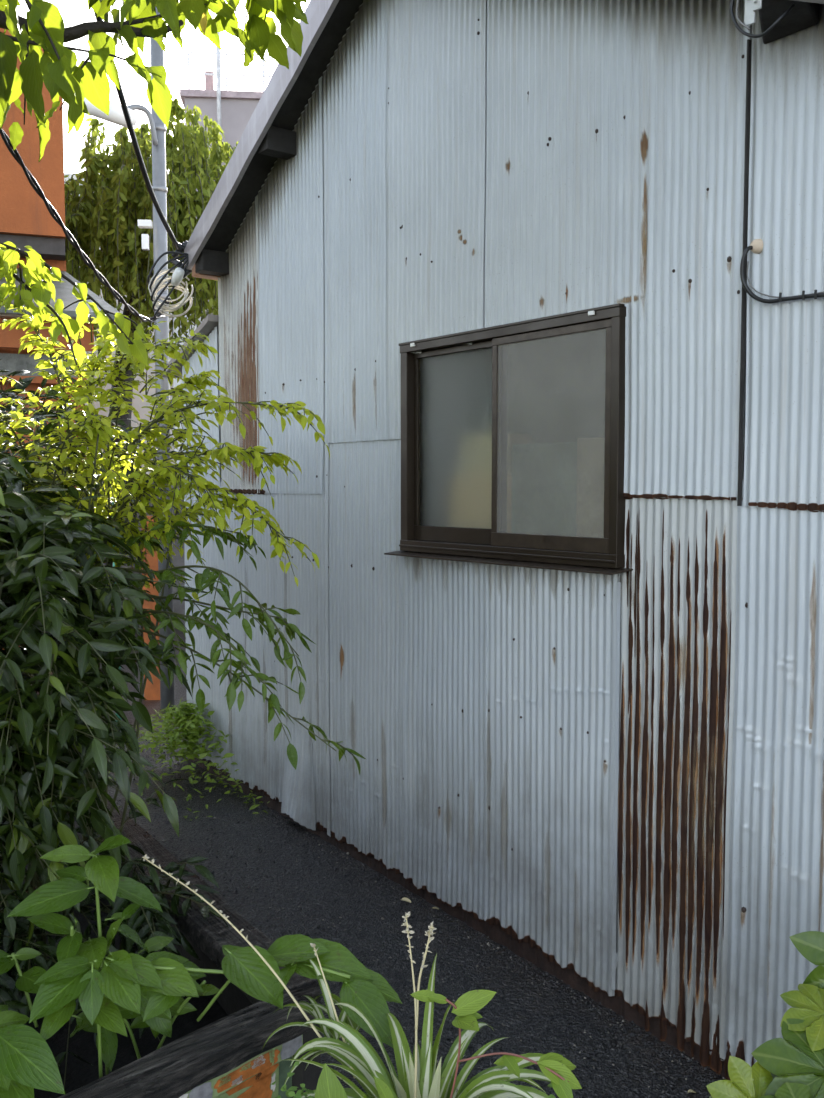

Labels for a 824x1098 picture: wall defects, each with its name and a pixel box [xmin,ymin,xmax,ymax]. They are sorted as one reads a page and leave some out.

rust [226,277,265,495]
rust [316,493,824,1080]